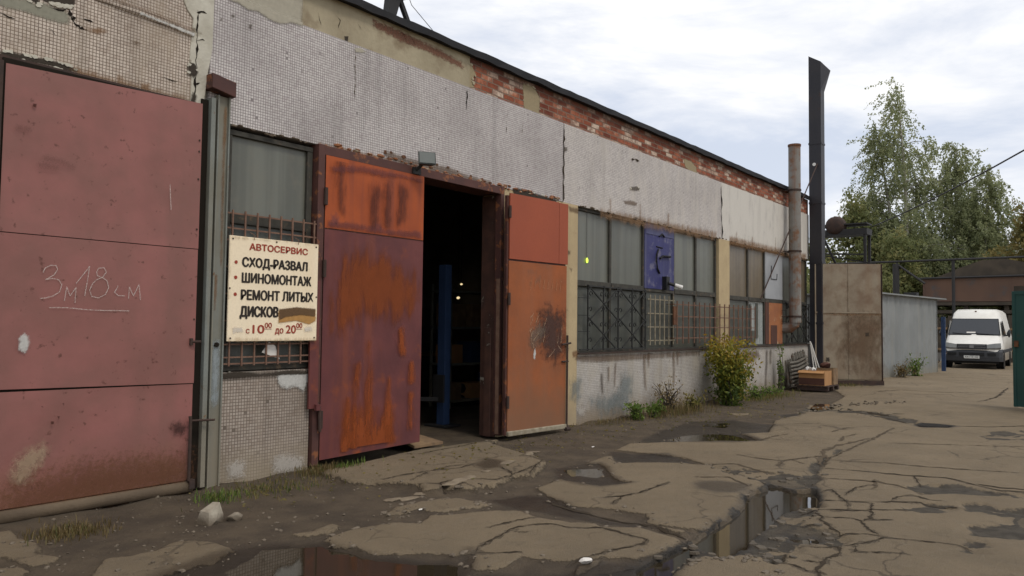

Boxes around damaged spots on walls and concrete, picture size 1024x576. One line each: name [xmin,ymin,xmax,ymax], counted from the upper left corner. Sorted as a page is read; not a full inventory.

crack [164,11,207,94]
peeling [373,19,476,85]
crack [560,124,568,201]
rust [341,364,394,452]
crack [945,388,1024,447]
crack [694,410,969,573]